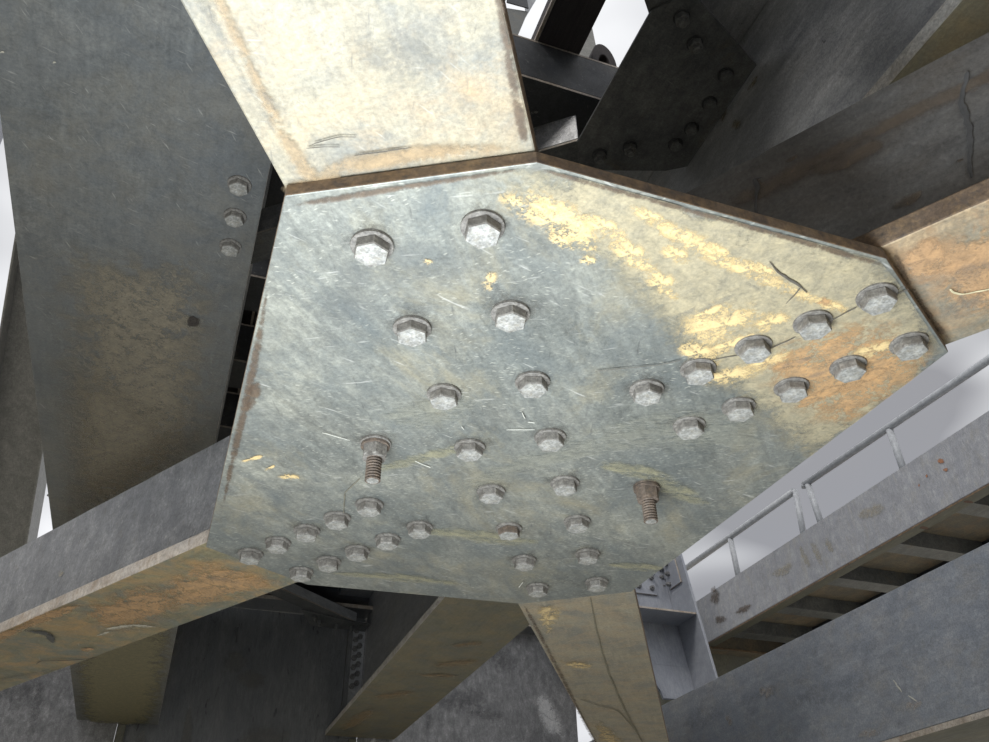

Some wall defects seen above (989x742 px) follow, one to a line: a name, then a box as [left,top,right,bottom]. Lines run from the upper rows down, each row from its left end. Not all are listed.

crack [958,71,973,178]
rust [306,170,513,204]
peeling [501,192,678,299]
peeling [678,304,791,384]
peeling [631,206,847,312]
rust [515,171,989,456]
crack [769,261,807,304]
peeling [854,341,890,358]
rust [0,606,77,640]
rust [90,565,267,625]
rust [78,630,170,725]